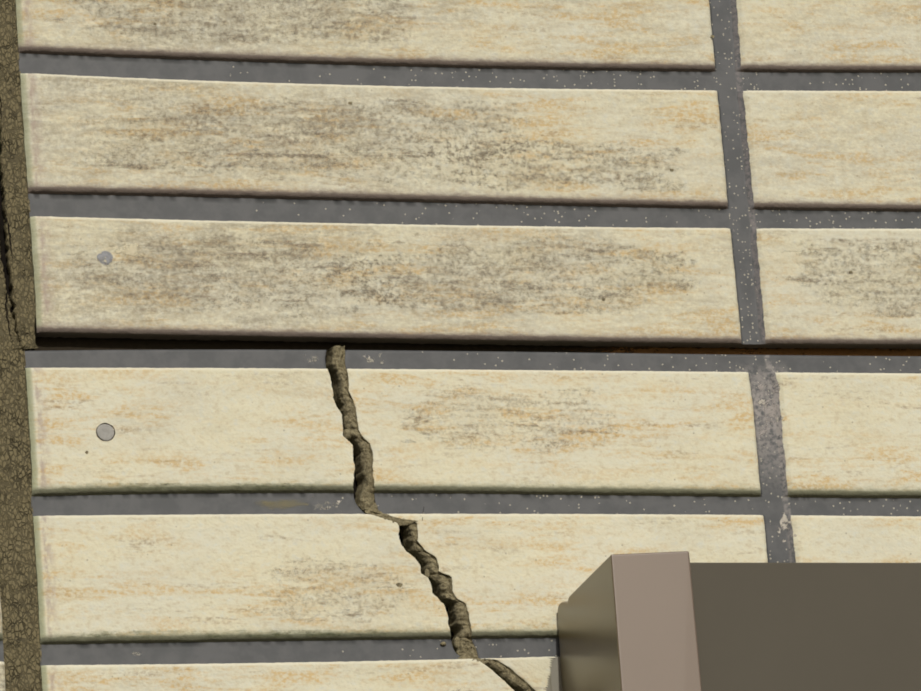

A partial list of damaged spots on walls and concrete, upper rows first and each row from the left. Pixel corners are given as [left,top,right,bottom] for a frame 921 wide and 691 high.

crack [0,98,25,349]
crack [325,346,535,691]